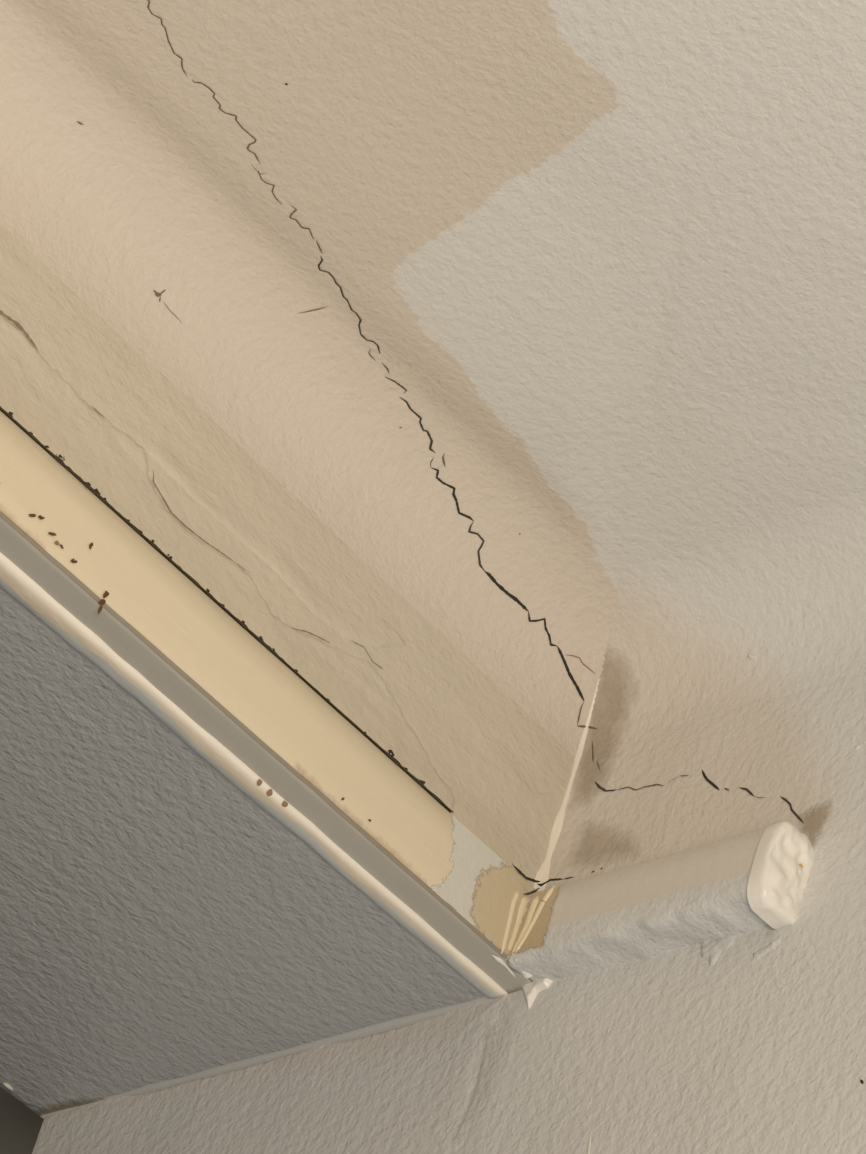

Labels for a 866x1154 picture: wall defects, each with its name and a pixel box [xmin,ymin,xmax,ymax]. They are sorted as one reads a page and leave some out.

crack [147,0,804,823]